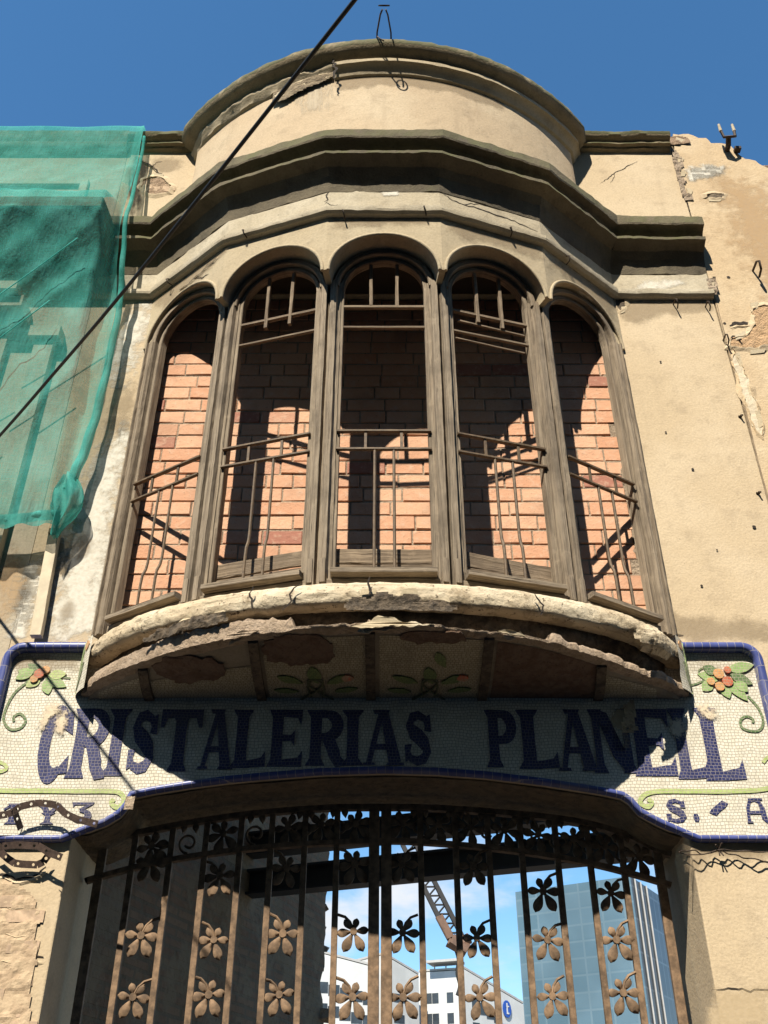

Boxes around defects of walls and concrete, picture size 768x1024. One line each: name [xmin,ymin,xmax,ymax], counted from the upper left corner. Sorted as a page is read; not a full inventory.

spalling [137,173,177,198]
spalling [670,136,728,202]
flaking render [723,301,768,441]
spalling [81,588,719,719]
peeling [38,703,68,735]